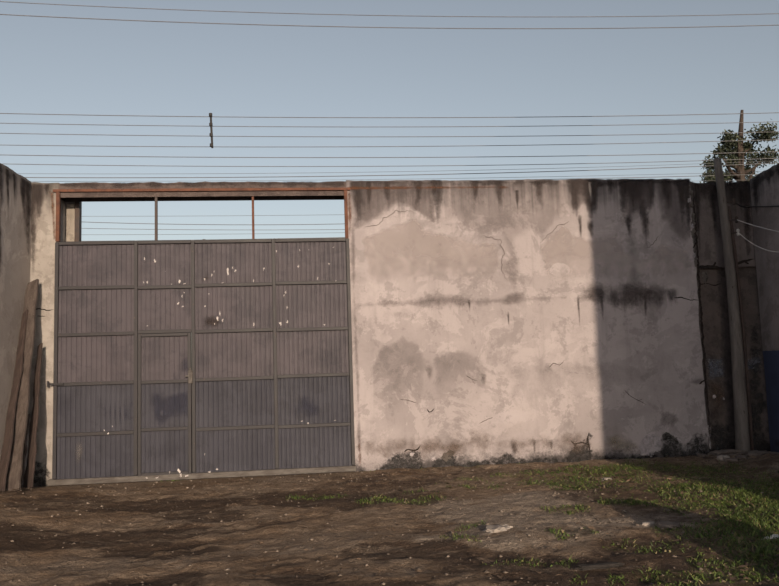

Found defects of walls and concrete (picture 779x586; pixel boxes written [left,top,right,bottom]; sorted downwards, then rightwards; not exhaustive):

water stain [0,164,48,241]
water stain [253,181,396,209]
water stain [407,180,442,210]
water stain [472,180,506,201]
water stain [516,180,552,203]
water stain [376,422,733,470]